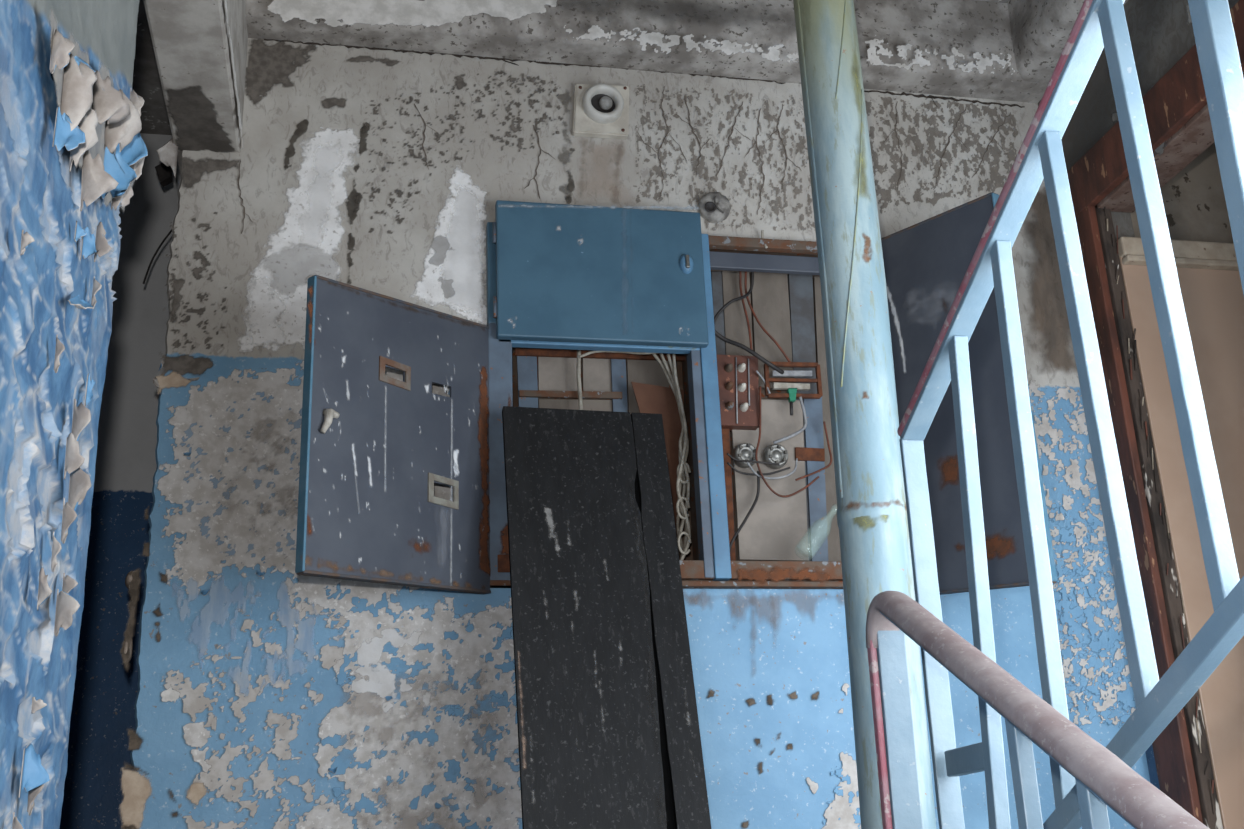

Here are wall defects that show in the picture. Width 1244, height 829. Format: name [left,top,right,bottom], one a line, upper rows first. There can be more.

peeling [267,0,557,27]
peeling [564,25,799,63]
peeling [49,9,148,309]
peeling [20,230,35,256]
peeling [54,335,65,373]
peeling [37,373,95,637]
peeling [120,212,522,829]
peeling [1028,380,1136,730]
peeling [746,695,773,706]
peeling [12,744,50,829]
peeling [755,733,793,774]
peeling [822,752,861,829]